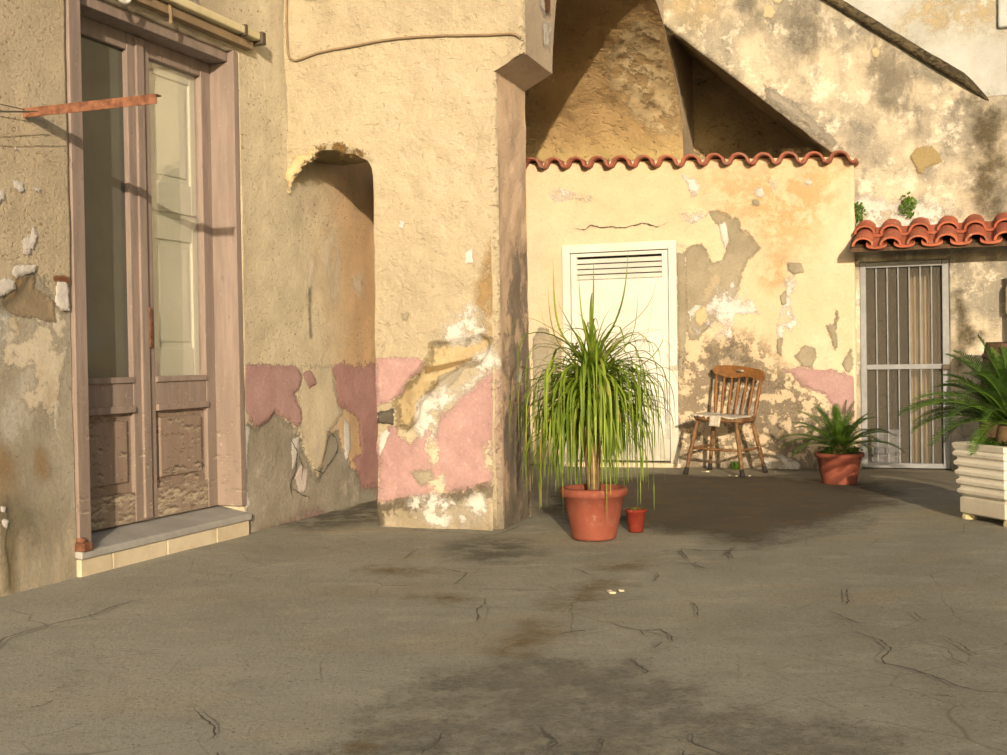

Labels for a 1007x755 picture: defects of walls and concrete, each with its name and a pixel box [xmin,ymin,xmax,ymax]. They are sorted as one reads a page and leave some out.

water stain [870,42,907,107]
water stain [972,108,1007,217]
crack [572,222,671,230]
spalling [677,210,761,376]
spalling [0,225,77,597]
spalling [245,249,501,533]
water stain [600,336,891,543]
peeling [782,311,854,416]
crack [3,496,11,582]
water stain [0,503,31,592]
crack [831,588,1007,697]
crack [185,706,219,755]